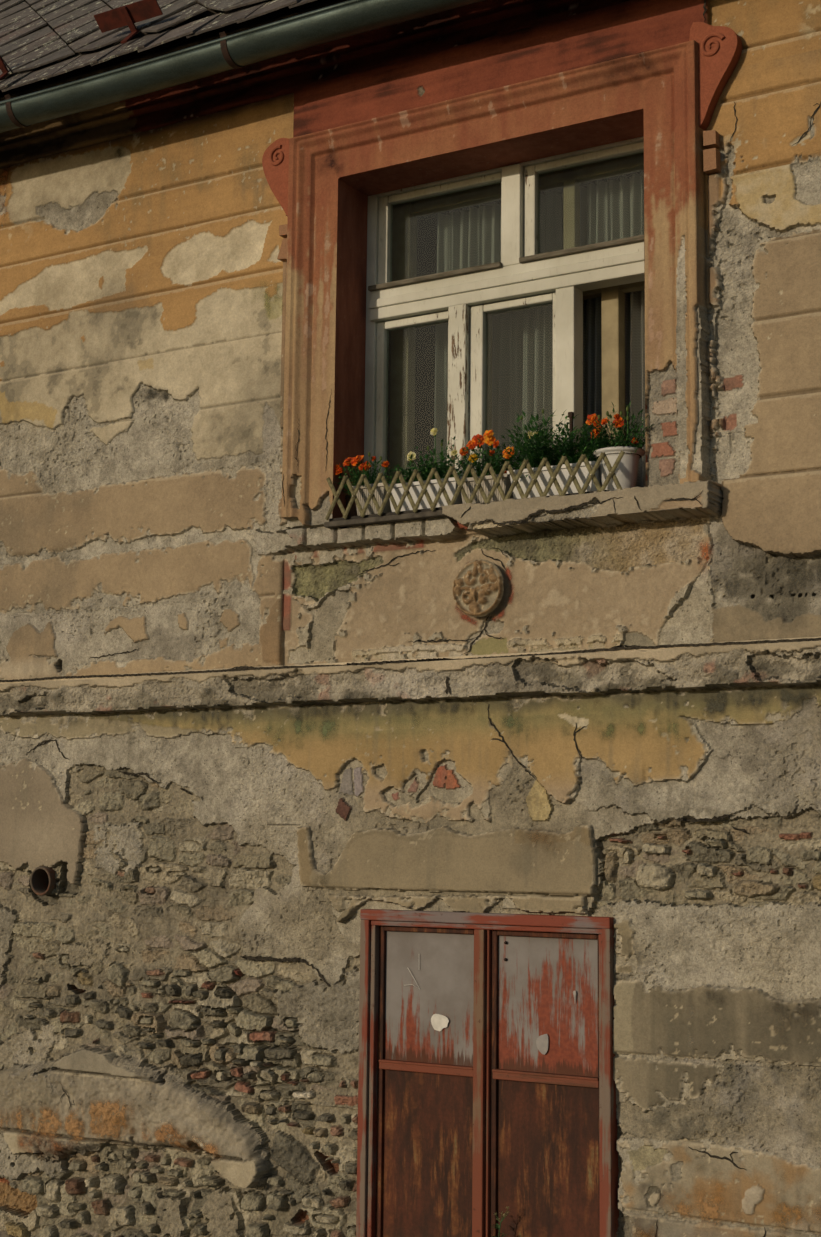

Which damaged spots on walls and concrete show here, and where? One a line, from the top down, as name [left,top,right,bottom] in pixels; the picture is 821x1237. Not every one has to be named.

crack [792,103,821,146]
peeling [0,145,132,231]
spalling [352,142,821,662]
peeling [0,219,332,670]
crack [461,490,703,572]
spalling [292,555,384,599]
crack [0,616,821,694]
crack [26,739,70,760]
crack [119,771,193,795]
crack [480,699,536,780]
crack [573,724,587,759]
flaking render [0,696,821,1237]